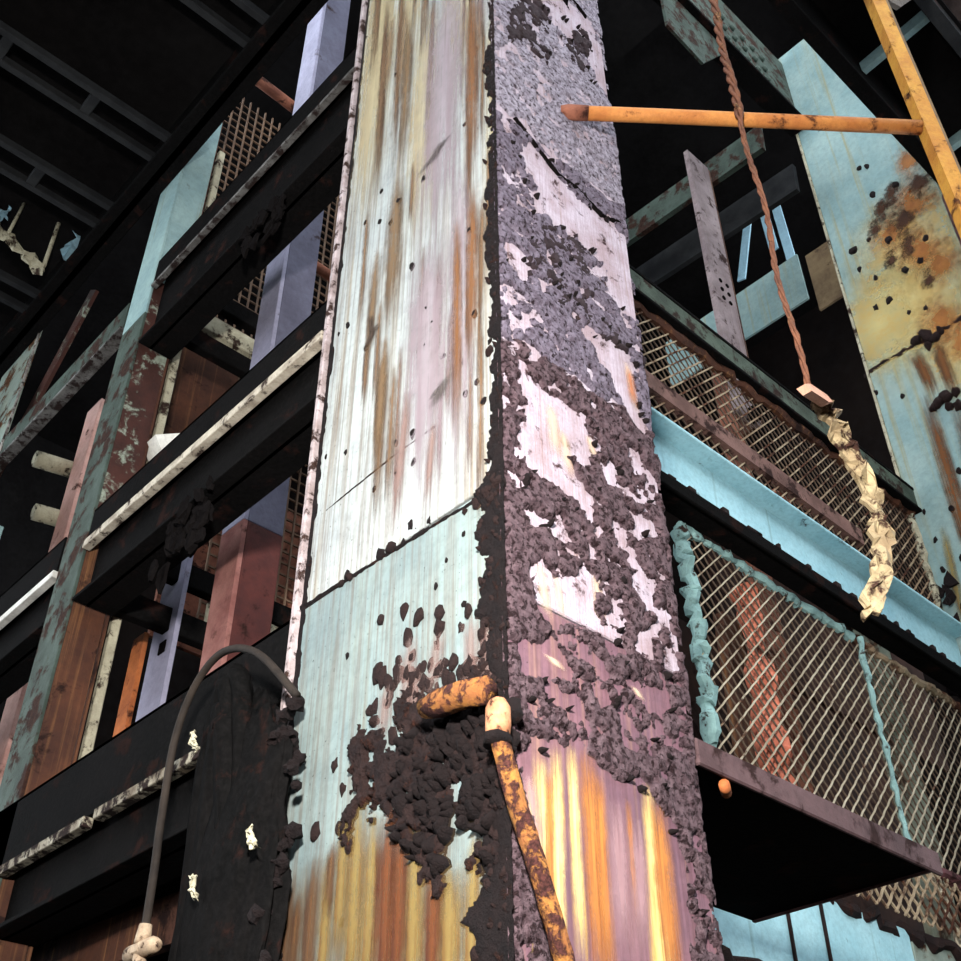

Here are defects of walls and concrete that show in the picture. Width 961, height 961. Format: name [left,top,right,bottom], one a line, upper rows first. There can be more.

spalling [506,0,607,97]
rust [293,0,435,689]
rust [439,0,510,700]
spalling [521,224,647,369]
rust [853,152,961,390]
spalling [376,519,413,561]
peeling [462,475,506,515]
peeling [521,469,538,489]
rust [922,538,961,616]
rust [280,656,515,961]
rust [528,766,615,961]
rust [627,799,681,961]